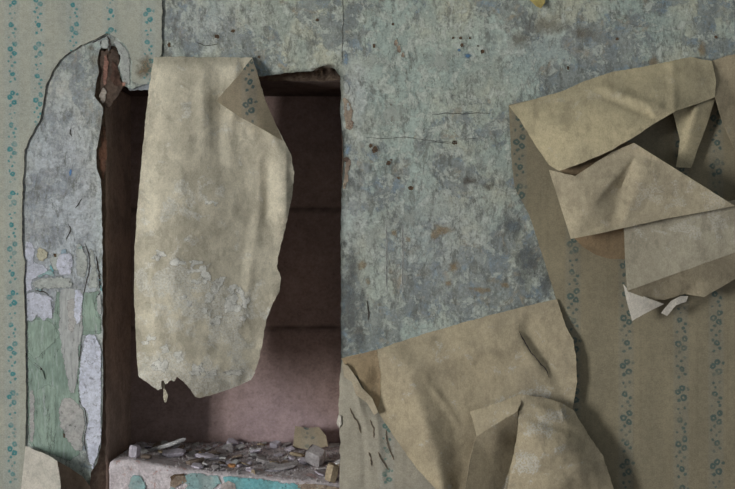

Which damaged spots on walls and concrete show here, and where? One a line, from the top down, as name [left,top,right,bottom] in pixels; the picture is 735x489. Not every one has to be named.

flaking render [99,39,149,107]
flaking render [98,126,107,180]
peeling [24,241,102,469]